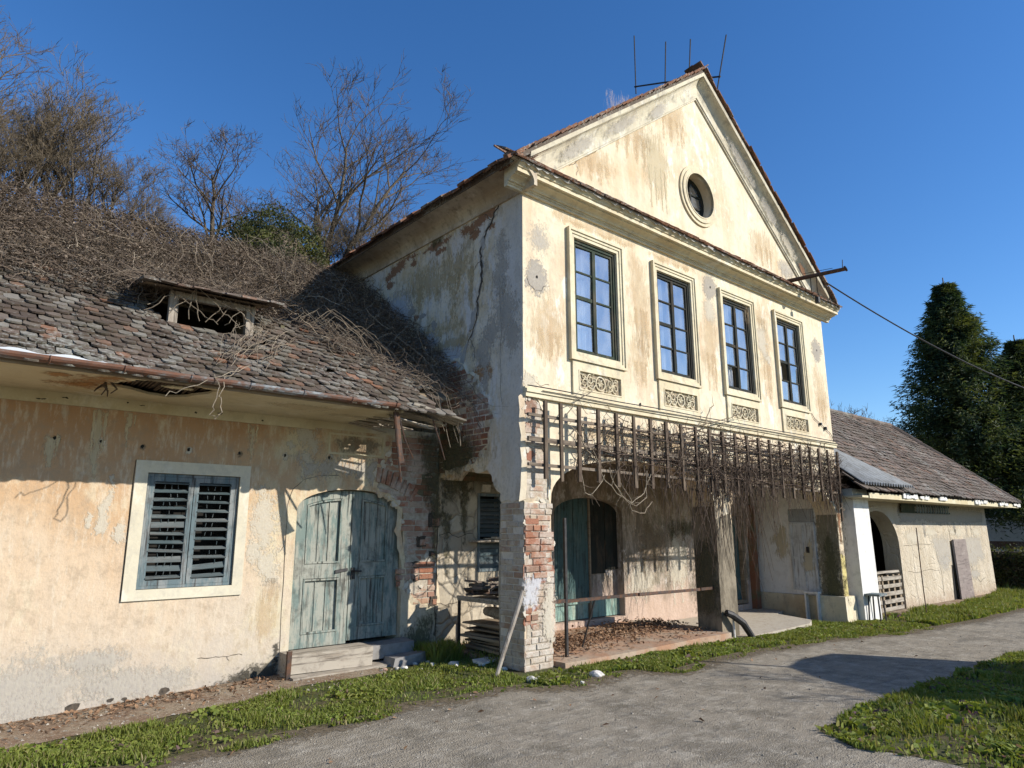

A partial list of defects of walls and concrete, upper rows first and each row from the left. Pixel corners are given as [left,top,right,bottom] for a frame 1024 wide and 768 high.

peeling [385,207,496,290]
crack [467,206,502,401]
water stain [561,102,670,214]
peeling [520,158,840,309]
spalling [283,357,498,612]
flaking render [498,370,555,673]